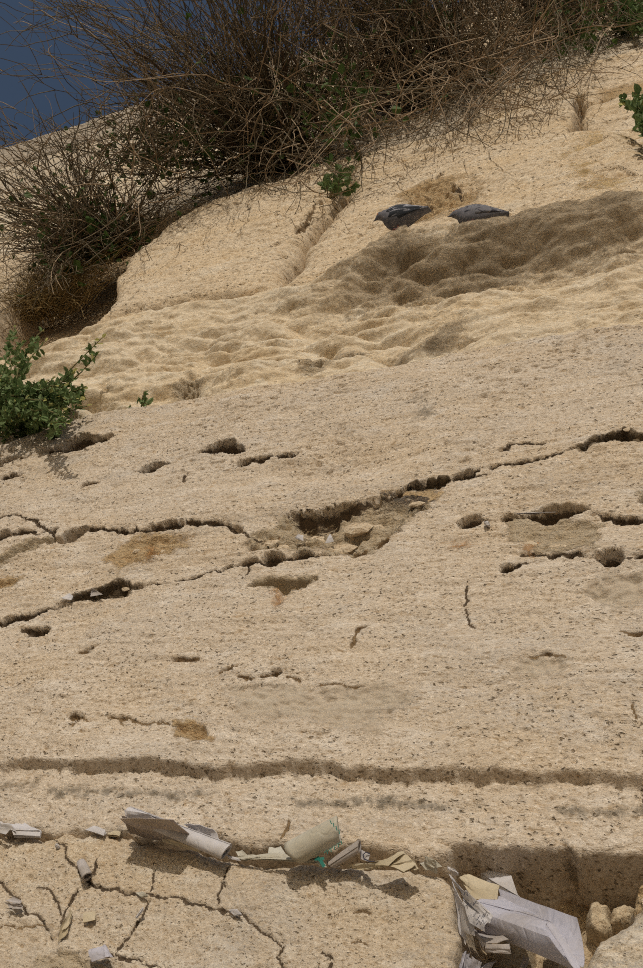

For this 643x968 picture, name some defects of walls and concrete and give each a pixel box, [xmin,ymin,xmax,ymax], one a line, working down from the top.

crack [49,439,107,454]
crack [202,444,296,466]
crack [450,442,568,482]
crack [0,494,403,586]
spalling [246,475,451,558]
crack [459,511,643,529]
crack [0,608,57,637]
spalling [70,532,192,602]
spalling [248,574,318,596]
crack [463,581,476,629]
crack [502,551,643,574]
crack [0,841,292,968]